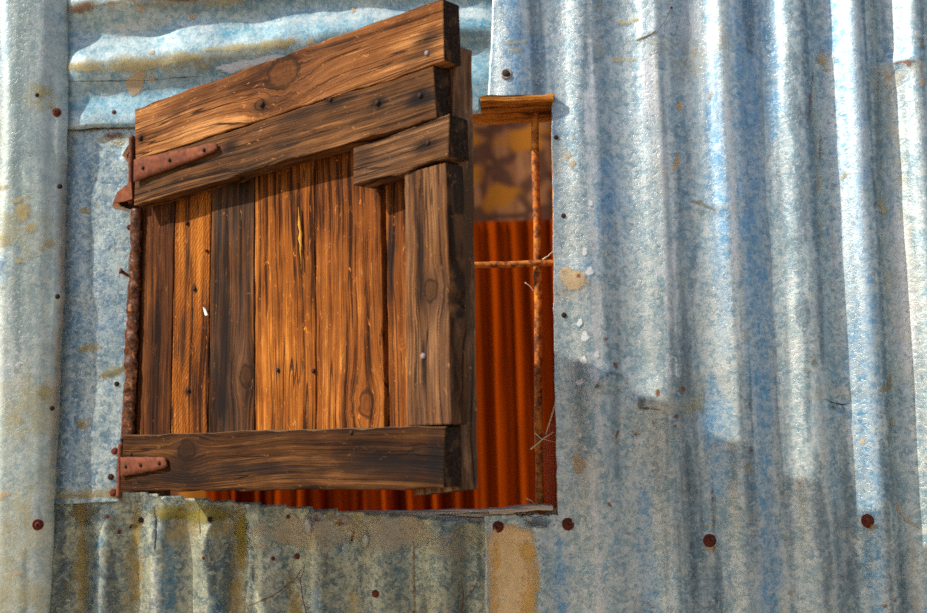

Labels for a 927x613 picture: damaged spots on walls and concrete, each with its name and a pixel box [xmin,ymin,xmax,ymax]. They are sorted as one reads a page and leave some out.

corrosion [68,38,297,73]
damp [151,502,246,559]
corrosion [487,525,539,613]